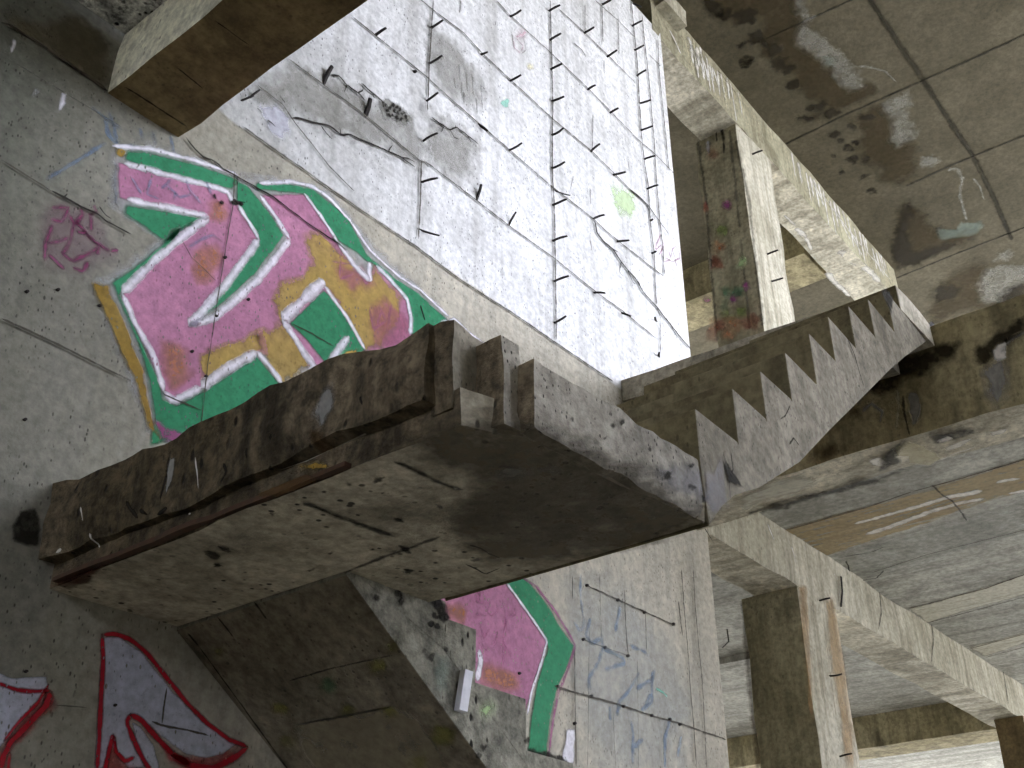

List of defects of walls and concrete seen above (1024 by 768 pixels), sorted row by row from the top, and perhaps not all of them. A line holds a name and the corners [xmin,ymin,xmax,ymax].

crack [257,96,415,167]
crack [331,74,390,112]
crack [432,117,478,144]
damp [704,0,937,193]
damp [670,31,984,341]
crack [594,221,691,349]
damp [974,318,1024,402]
damp [742,343,975,513]